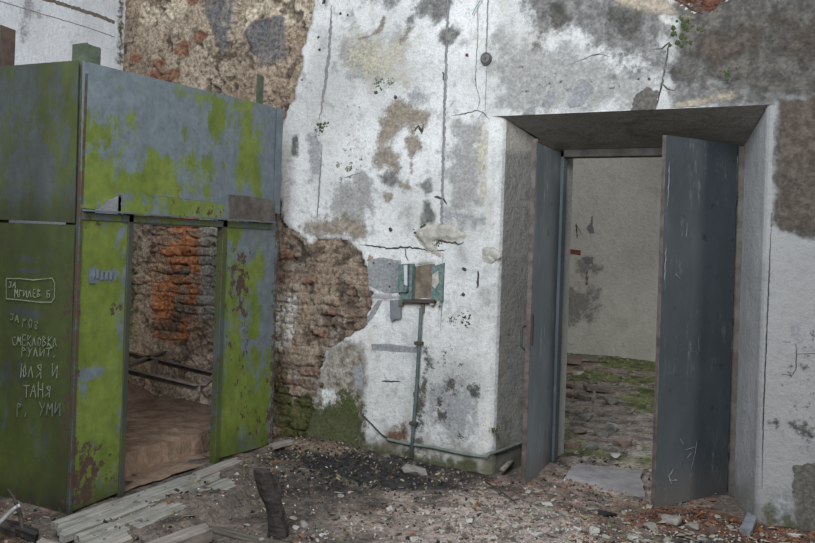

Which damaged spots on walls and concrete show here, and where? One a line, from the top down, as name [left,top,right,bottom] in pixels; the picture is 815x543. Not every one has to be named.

crack [0,1,114,37]
flaking render [123,0,319,124]
water stain [340,0,460,85]
crack [653,42,674,105]
peeling [615,0,726,17]
water stain [492,0,815,238]
water stain [299,91,430,239]
water stain [420,179,435,224]
crack [360,239,463,263]
flaking render [128,215,217,406]
flaking render [272,201,378,448]